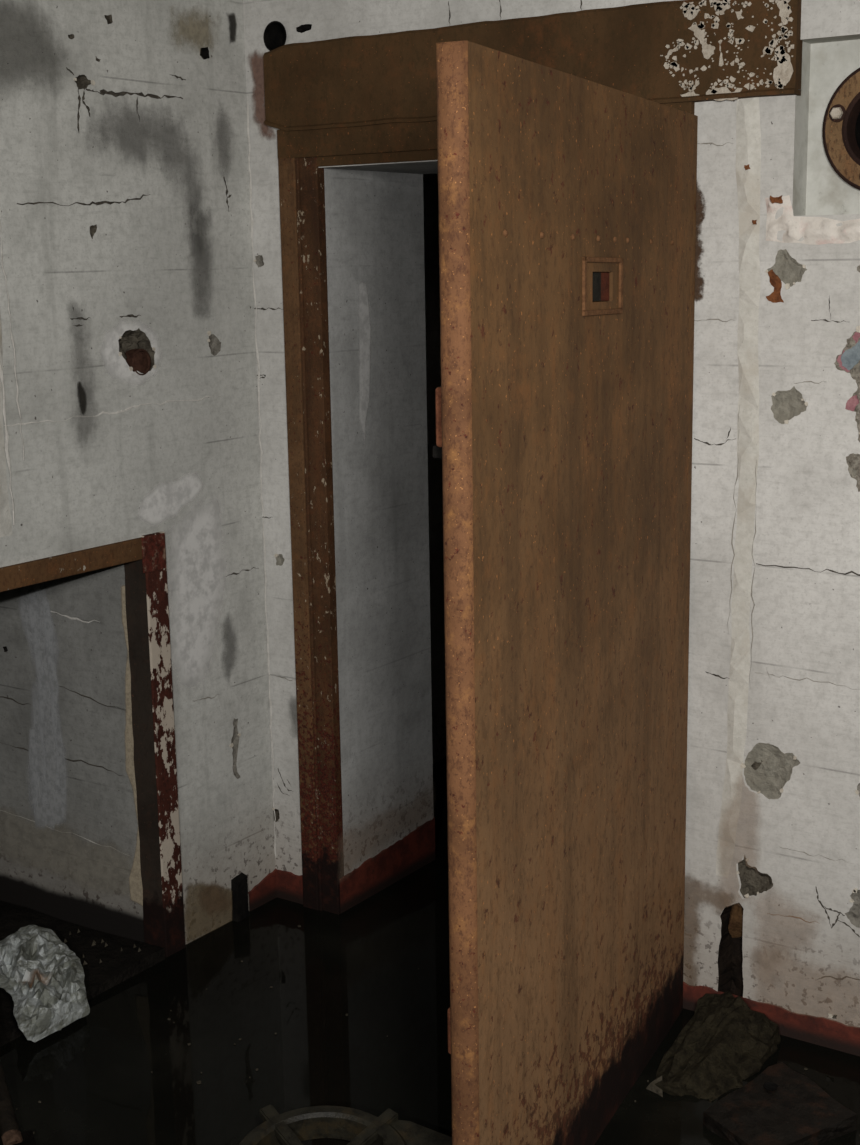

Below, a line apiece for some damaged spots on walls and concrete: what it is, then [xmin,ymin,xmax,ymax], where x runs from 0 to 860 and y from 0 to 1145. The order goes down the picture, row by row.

peeling [660,0,794,101]
spalling [766,249,807,303]
spalling [771,386,808,424]
peeling [834,326,860,492]
spalling [740,743,800,799]
spalling [737,855,773,898]
spalling [816,887,860,937]